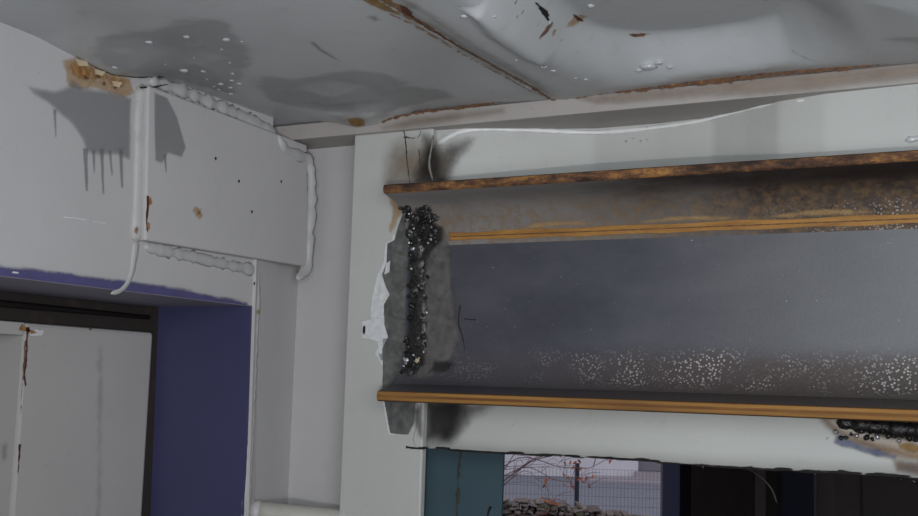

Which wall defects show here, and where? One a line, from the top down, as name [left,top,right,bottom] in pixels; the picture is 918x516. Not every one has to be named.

rust [364,0,556,101]
rust [617,64,880,93]
rust [449,210,918,241]
rust [19,324,44,409]